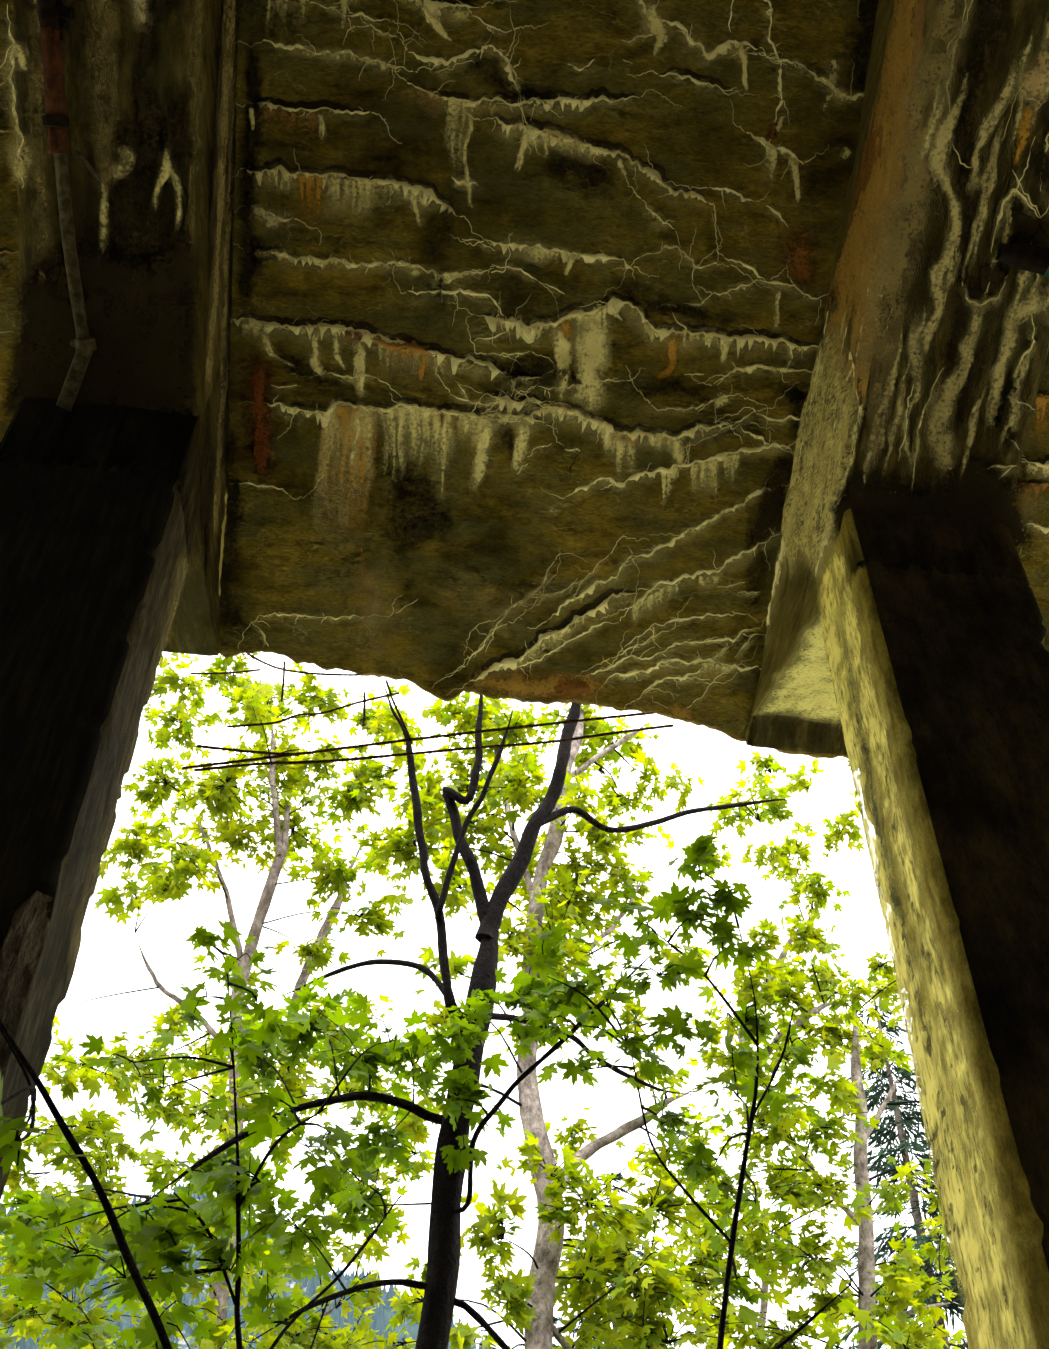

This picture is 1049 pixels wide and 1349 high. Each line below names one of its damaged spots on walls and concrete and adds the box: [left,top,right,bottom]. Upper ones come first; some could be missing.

water stain [471,55,555,107]
water stain [620,285,730,323]
water stain [280,351,336,386]
water stain [505,359,582,388]
crack [230,0,864,725]
water stain [499,423,524,463]
water stain [746,0,1049,1349]